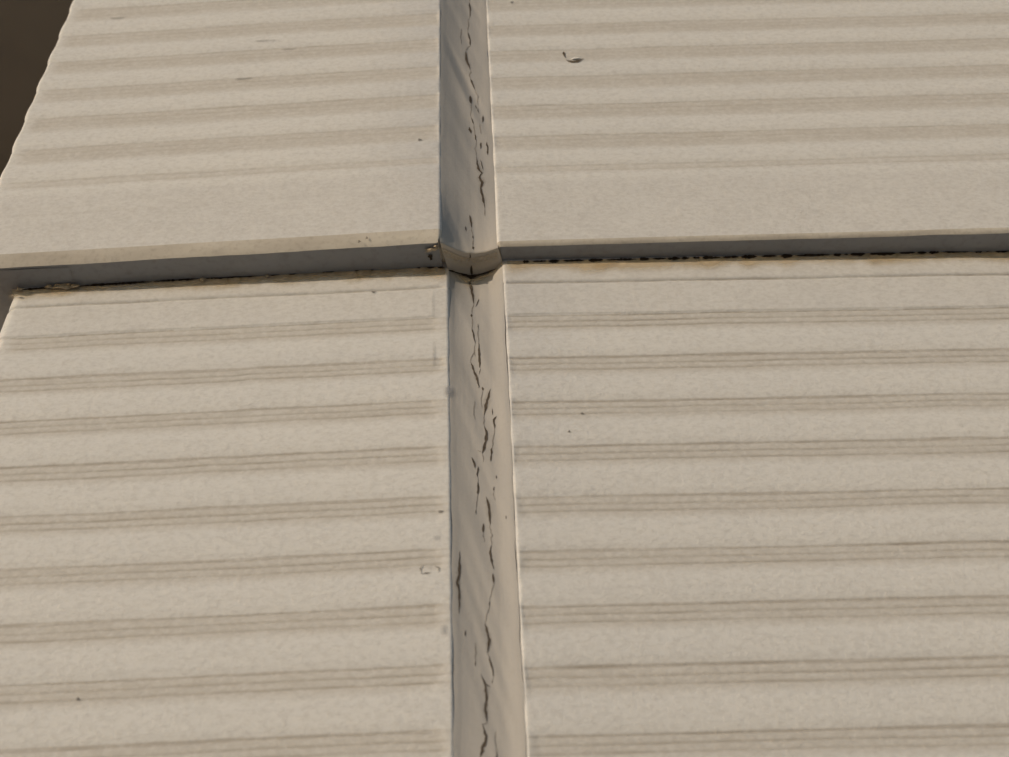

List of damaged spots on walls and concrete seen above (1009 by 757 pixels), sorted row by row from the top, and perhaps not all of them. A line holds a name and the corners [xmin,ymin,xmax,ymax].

crack [523,251,1008,263]
crack [81,273,297,286]
crack [417,0,507,757]